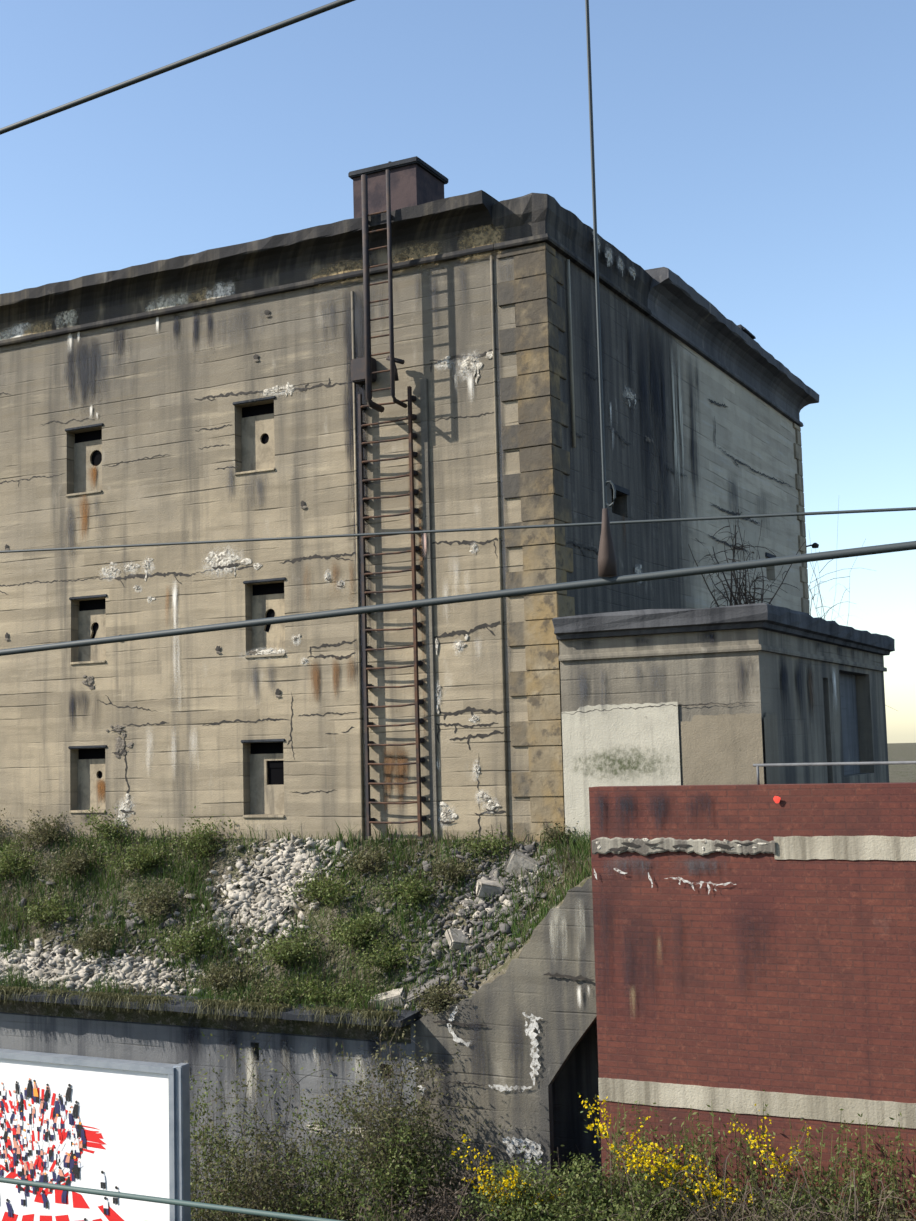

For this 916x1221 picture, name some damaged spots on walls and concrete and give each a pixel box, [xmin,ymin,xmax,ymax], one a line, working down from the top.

water stain [2,312,123,416]
water stain [629,336,698,510]
spalling [102,558,155,601]
crack [0,552,355,595]
spalling [205,549,262,577]
crack [436,706,509,834]
spalling [592,837,776,856]